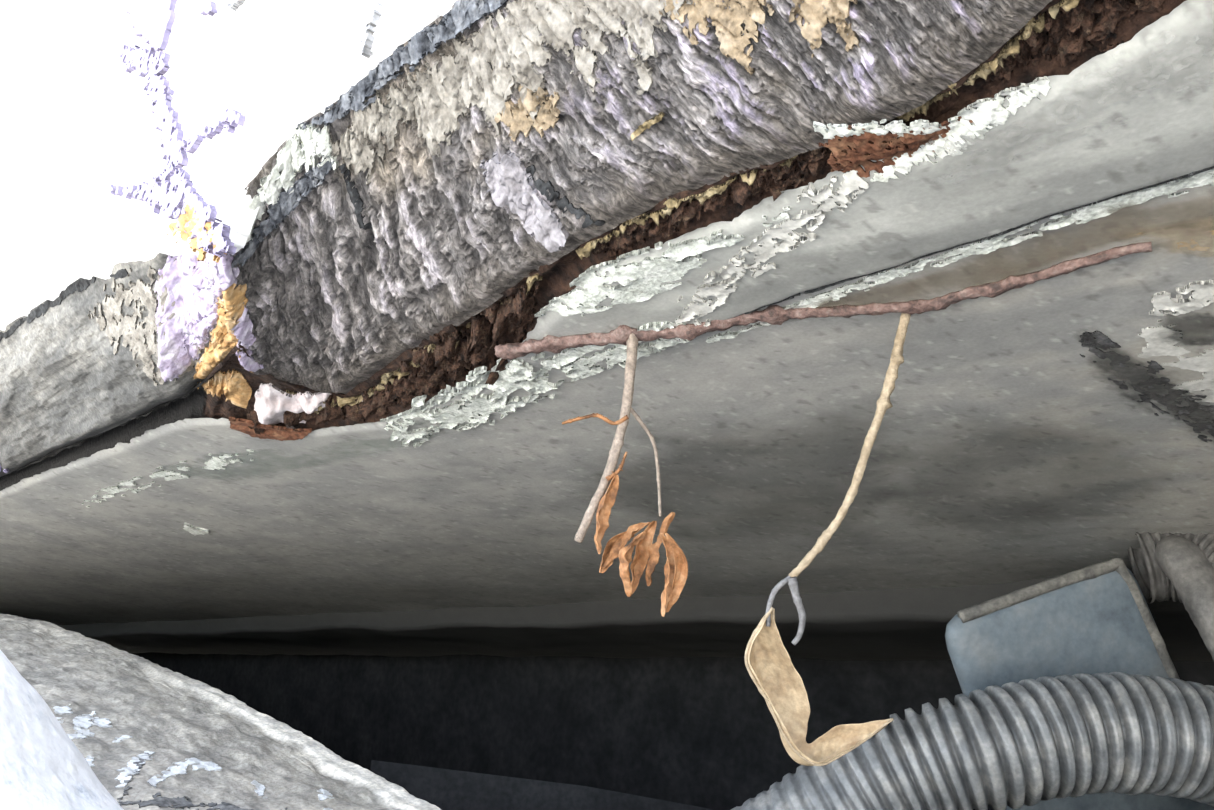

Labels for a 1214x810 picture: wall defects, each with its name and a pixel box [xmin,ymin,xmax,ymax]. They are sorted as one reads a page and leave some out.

flaking render [108,0,869,448]
rust [202,0,1187,441]
peeling [782,169,1214,309]
flaking render [87,266,202,386]
water stain [816,296,864,308]
peeling [1078,279,1214,443]
water stain [1092,340,1214,437]
water stain [1166,313,1214,345]
crack [117,753,254,810]